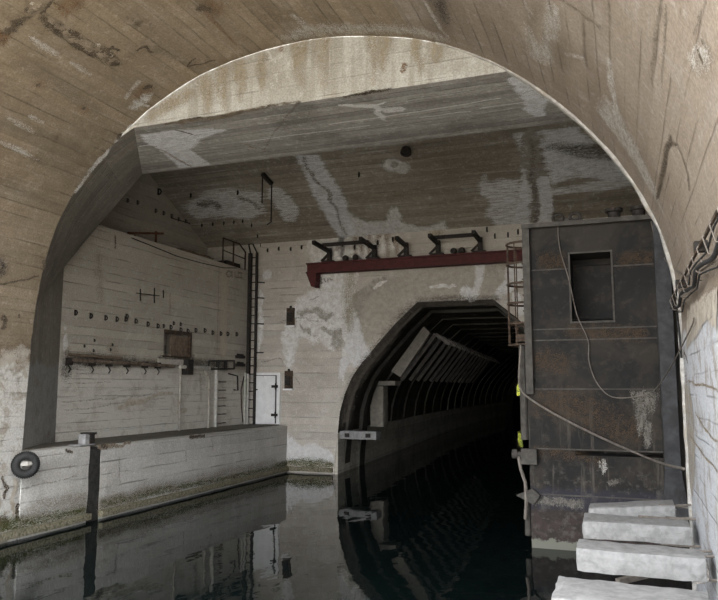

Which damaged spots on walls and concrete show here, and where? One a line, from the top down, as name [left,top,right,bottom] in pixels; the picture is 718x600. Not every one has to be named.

damp [278,0,468,93]
damp [129,53,269,121]
damp [295,124,632,238]
crack [655,132,689,200]
rust [529,384,658,456]
crack [687,380,718,392]
crack [689,411,717,472]
rust [529,495,584,509]